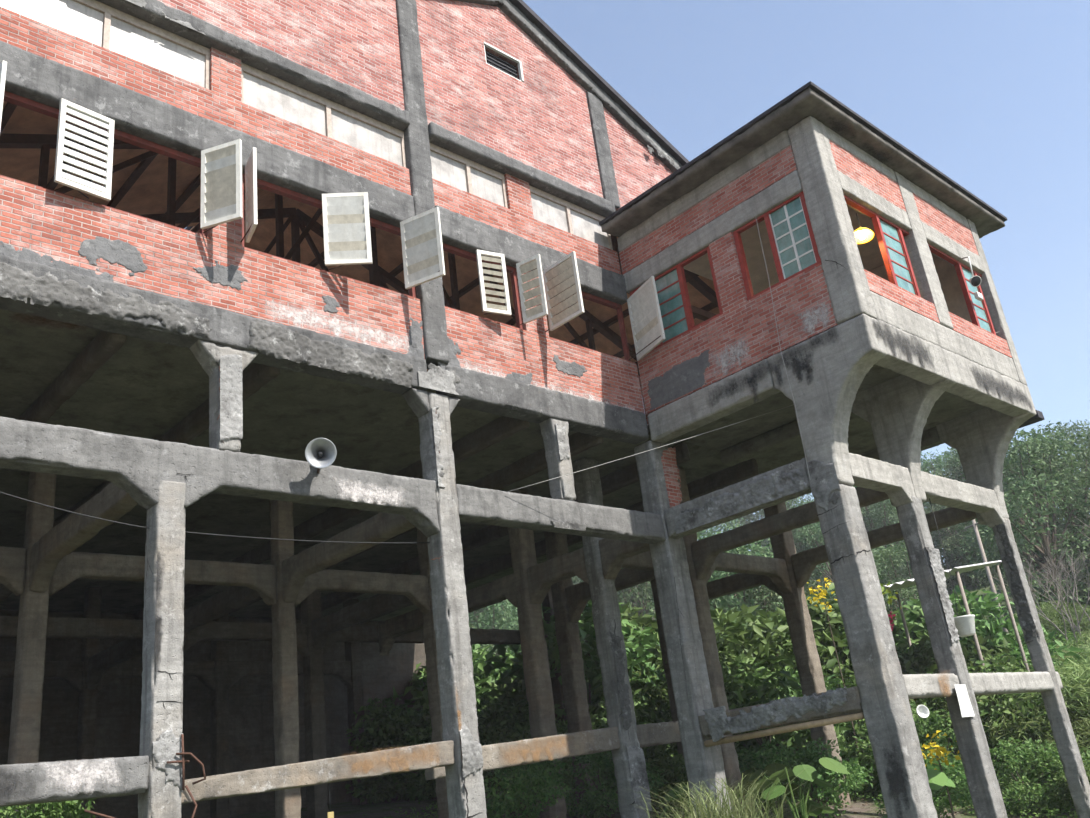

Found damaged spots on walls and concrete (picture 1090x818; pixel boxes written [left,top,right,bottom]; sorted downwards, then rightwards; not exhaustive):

spalling [0,253,212,339]
peeling [200,267,243,283]
water stain [874,322,933,368]
spalling [725,687,847,734]
crack [462,763,482,818]
water stain [884,752,909,818]